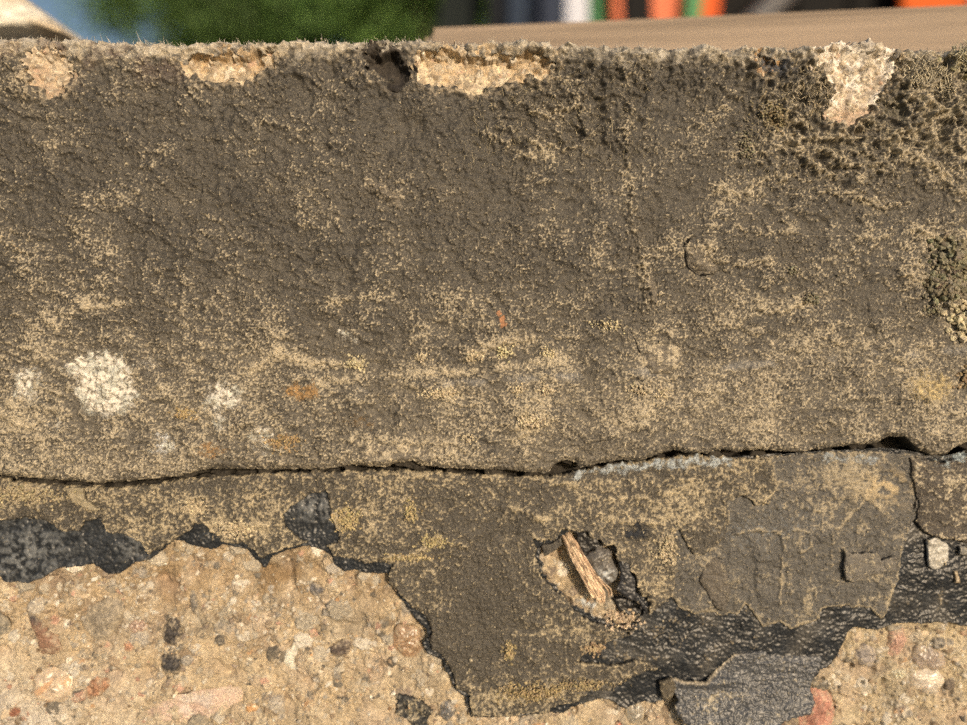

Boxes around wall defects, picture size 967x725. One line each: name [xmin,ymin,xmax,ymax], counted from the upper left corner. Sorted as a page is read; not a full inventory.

spalling [179,42,274,88]
spalling [354,40,558,96]
spalling [808,38,900,134]
crack [0,436,967,488]
peeling [0,447,967,725]